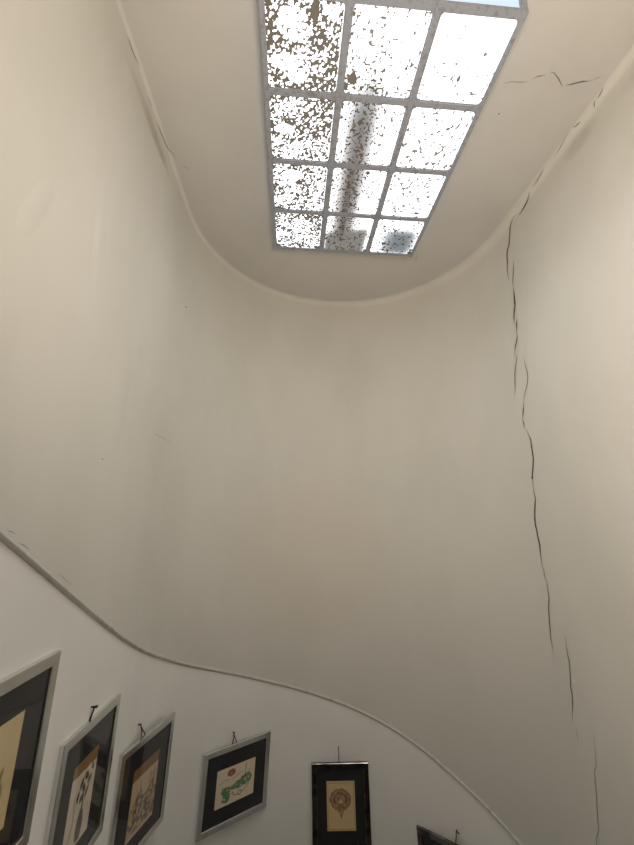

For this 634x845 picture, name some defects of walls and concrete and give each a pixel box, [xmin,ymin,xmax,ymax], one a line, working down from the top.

crack [506,195,551,638]